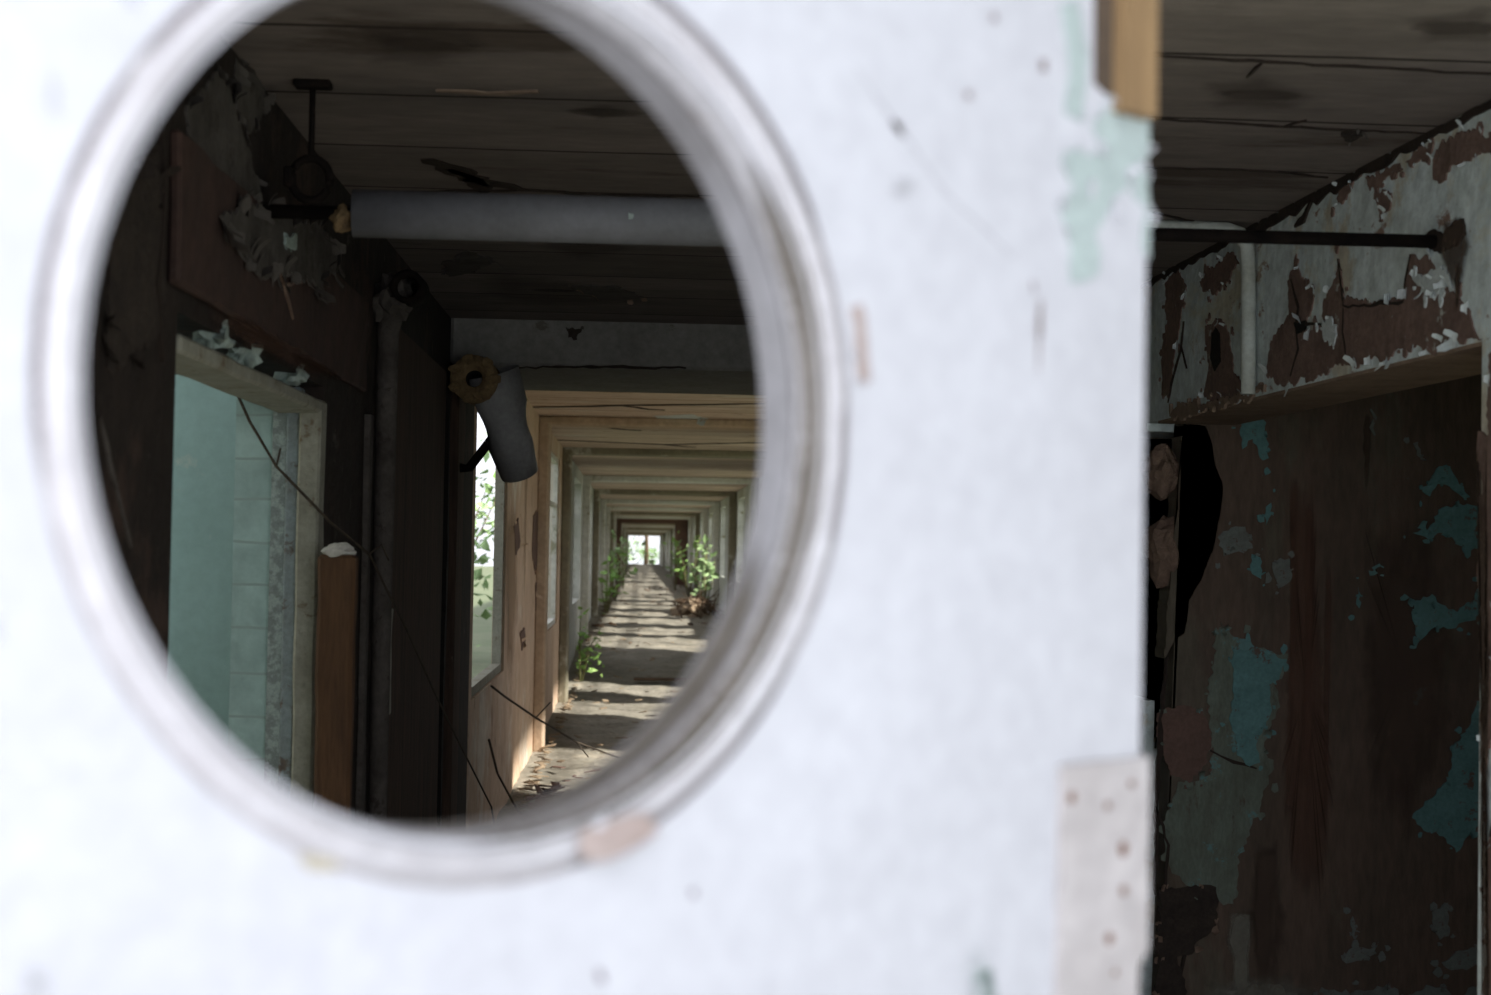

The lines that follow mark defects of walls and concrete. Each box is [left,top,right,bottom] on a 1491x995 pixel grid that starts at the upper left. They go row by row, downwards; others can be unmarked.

peeling [184,59,346,304]
peeling [1057,0,1158,283]
peeling [1330,119,1491,222]
flaking render [1142,443,1182,588]
peeling [1152,218,1491,995]